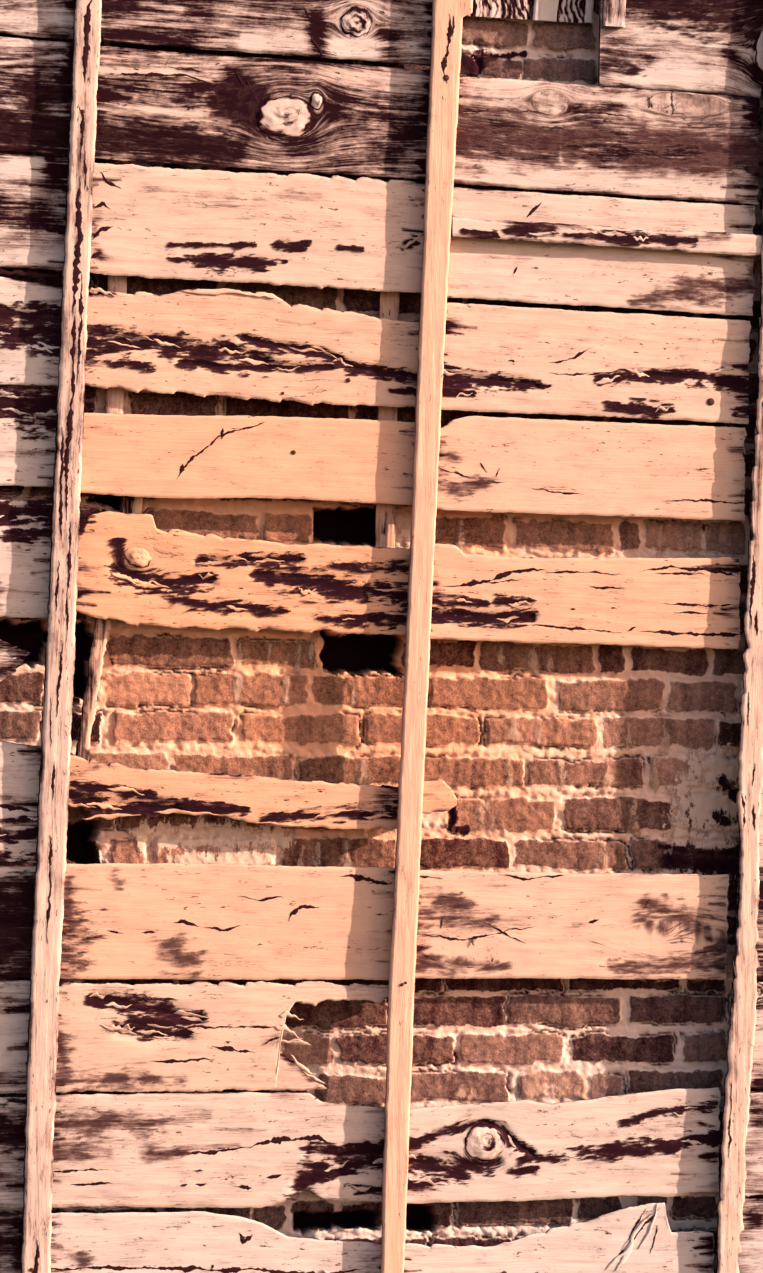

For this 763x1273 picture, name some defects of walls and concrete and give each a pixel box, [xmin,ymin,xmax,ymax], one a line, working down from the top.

peeling [460,228,500,239]
peeling [528,229,699,247]
crack [0,0,284,942]
peeling [196,556,282,579]
peeling [111,573,169,588]
peeling [350,581,403,592]
peeling [68,786,143,811]
spalling [662,742,739,850]
peeling [255,810,392,827]
spalling [445,793,470,836]
spalling [270,1024,327,1091]
peeling [324,1158,383,1192]